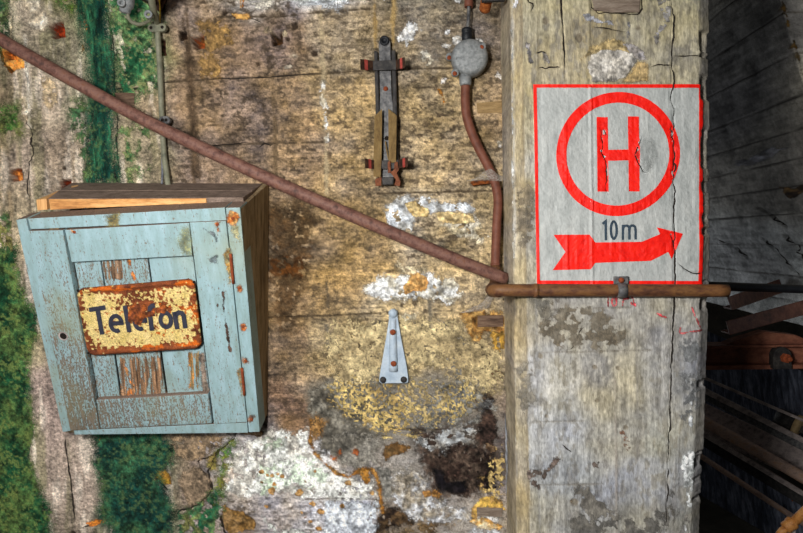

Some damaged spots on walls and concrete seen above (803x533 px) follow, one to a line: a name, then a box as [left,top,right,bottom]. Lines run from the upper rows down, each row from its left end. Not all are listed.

efflorescence [251,0,275,10]
efflorescence [289,0,349,11]
peeling [525,43,550,63]
spalling [585,22,649,83]
crack [20,122,34,207]
efflorescence [363,262,464,305]
efflorescence [384,194,488,244]
crack [651,1,702,524]
crack [763,209,803,274]
water stain [219,377,508,533]
rust [382,441,410,461]
rust [259,470,284,495]